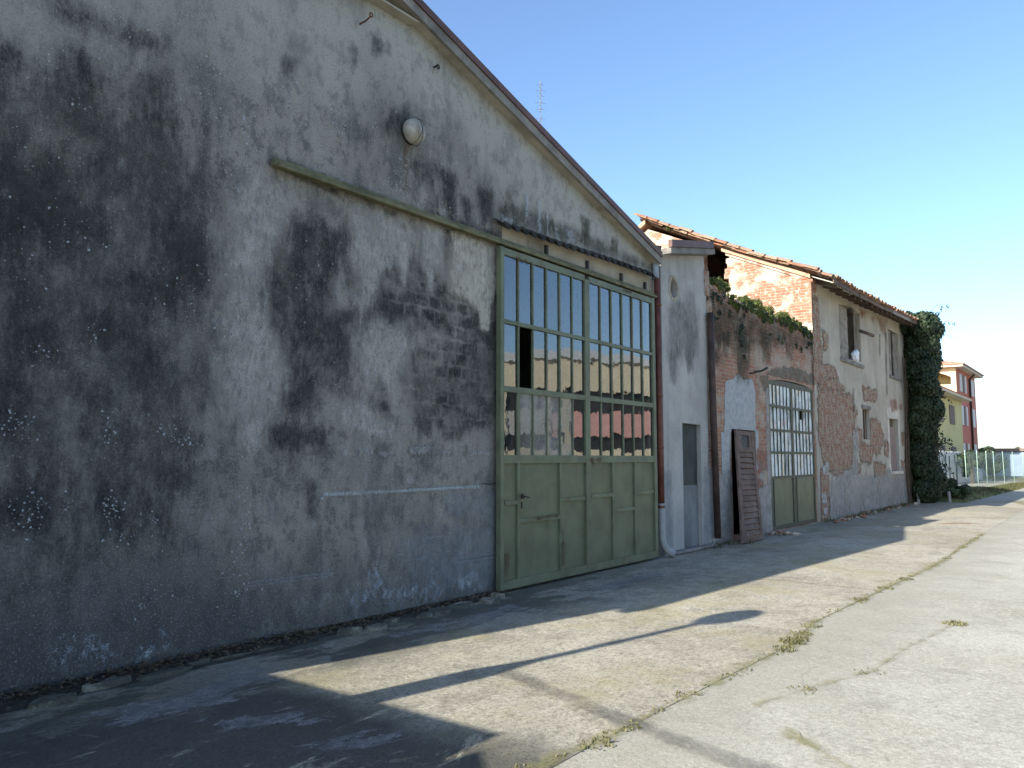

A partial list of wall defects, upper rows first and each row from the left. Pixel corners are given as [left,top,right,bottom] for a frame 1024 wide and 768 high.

leakage [0,56,209,531]
leakage [218,112,614,456]
peeling [755,375,771,484]
spalling [812,294,890,522]